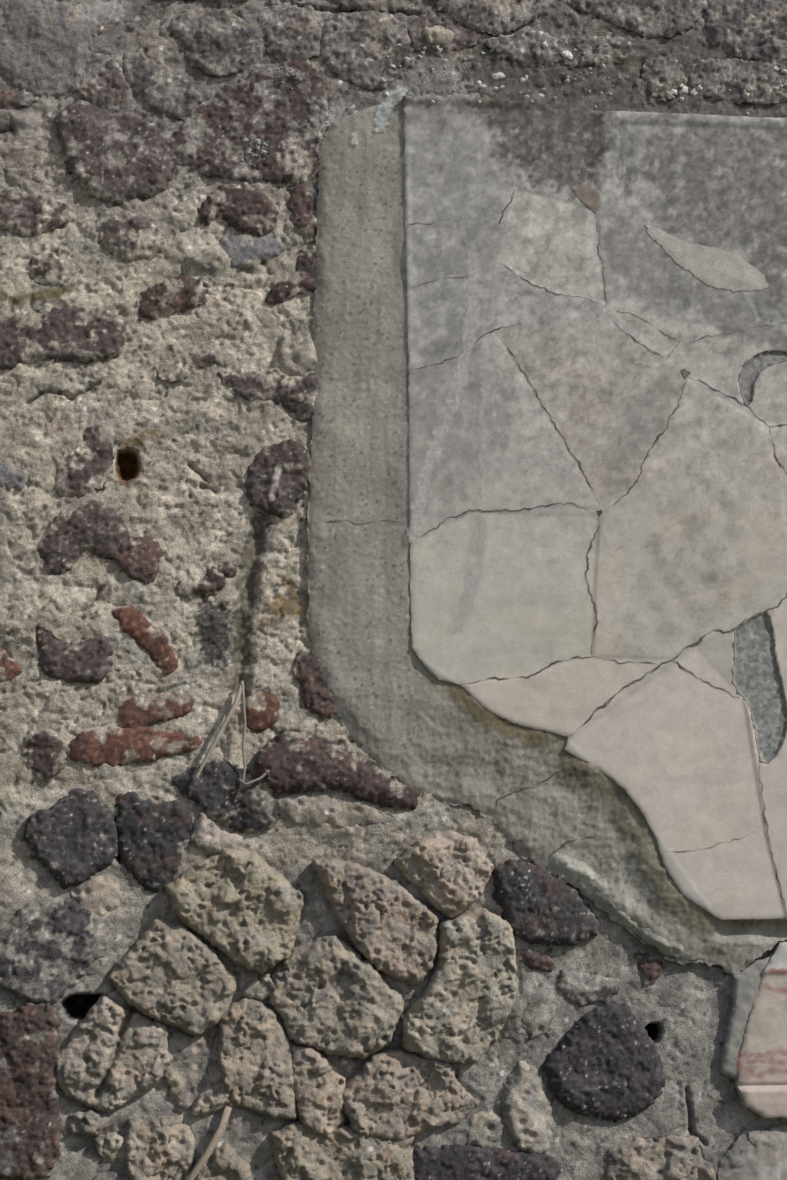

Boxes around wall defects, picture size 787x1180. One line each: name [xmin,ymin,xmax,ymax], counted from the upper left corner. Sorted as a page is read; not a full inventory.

crack [507,217,772,357]
crack [314,323,785,734]
spalling [732,611,787,764]
crack [494,771,559,812]
crack [670,764,787,914]